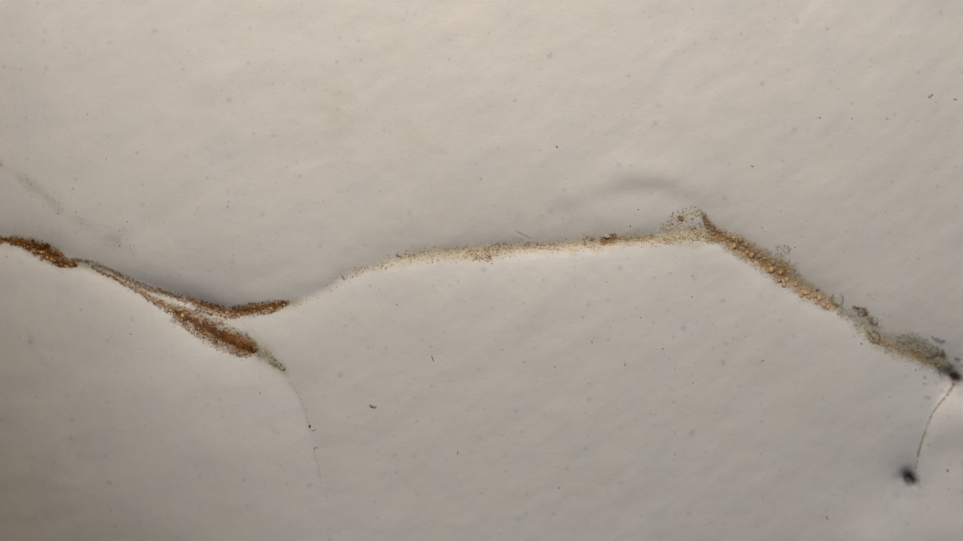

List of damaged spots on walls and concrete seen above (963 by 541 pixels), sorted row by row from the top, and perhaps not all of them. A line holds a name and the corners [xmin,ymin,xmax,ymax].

rust [0,236,289,371]
rust [350,207,716,278]